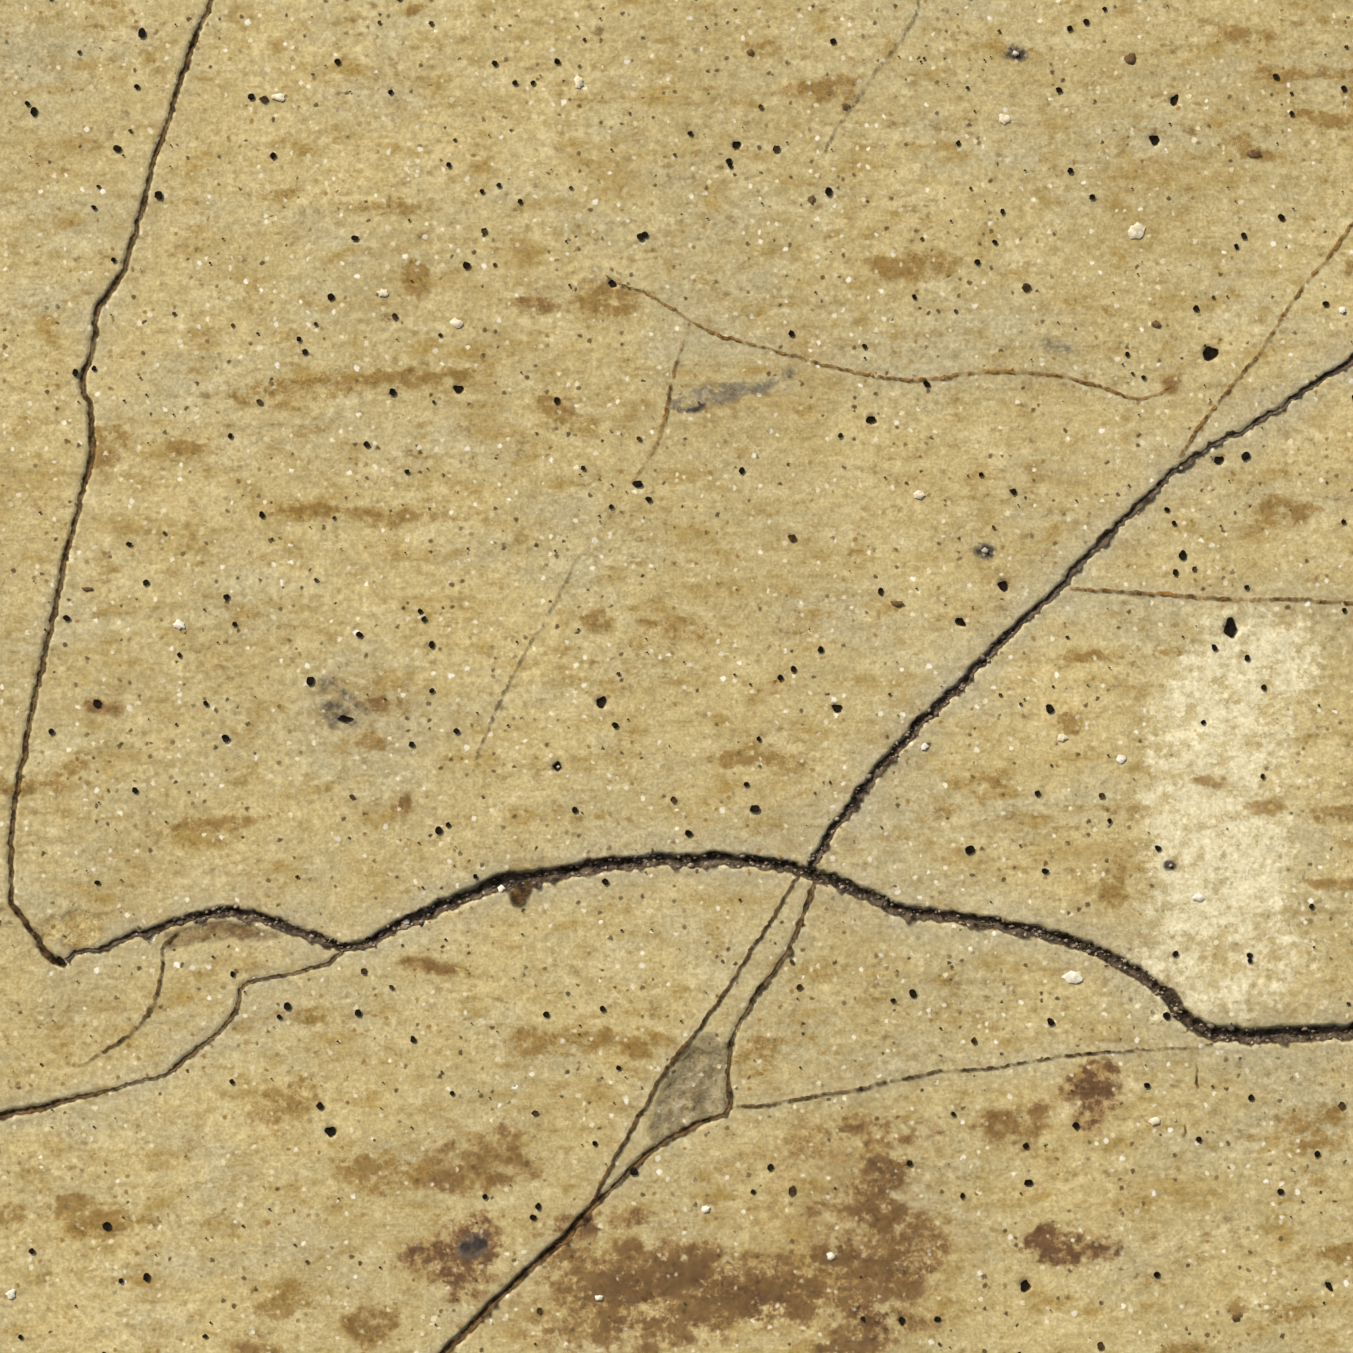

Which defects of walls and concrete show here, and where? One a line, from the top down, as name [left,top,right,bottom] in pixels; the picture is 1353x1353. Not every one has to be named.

crack [824,0,918,152]
crack [606,275,1169,474]
crack [1269,222,1353,336]
crack [7,0,212,967]
crack [0,352,1353,1353]